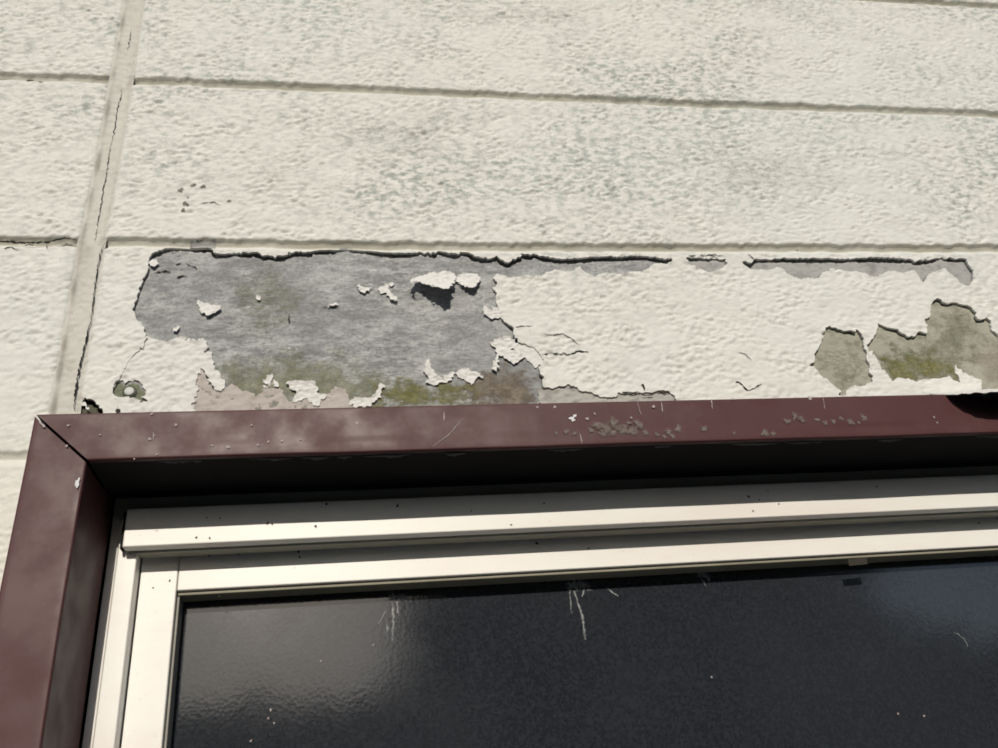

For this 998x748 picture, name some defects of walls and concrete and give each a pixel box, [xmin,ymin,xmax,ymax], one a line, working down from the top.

crack [0,89,122,409]
peeling [687,259,726,272]
peeling [743,258,972,286]
peeling [113,239,674,413]
peeling [809,300,998,399]
spalling [81,399,103,414]